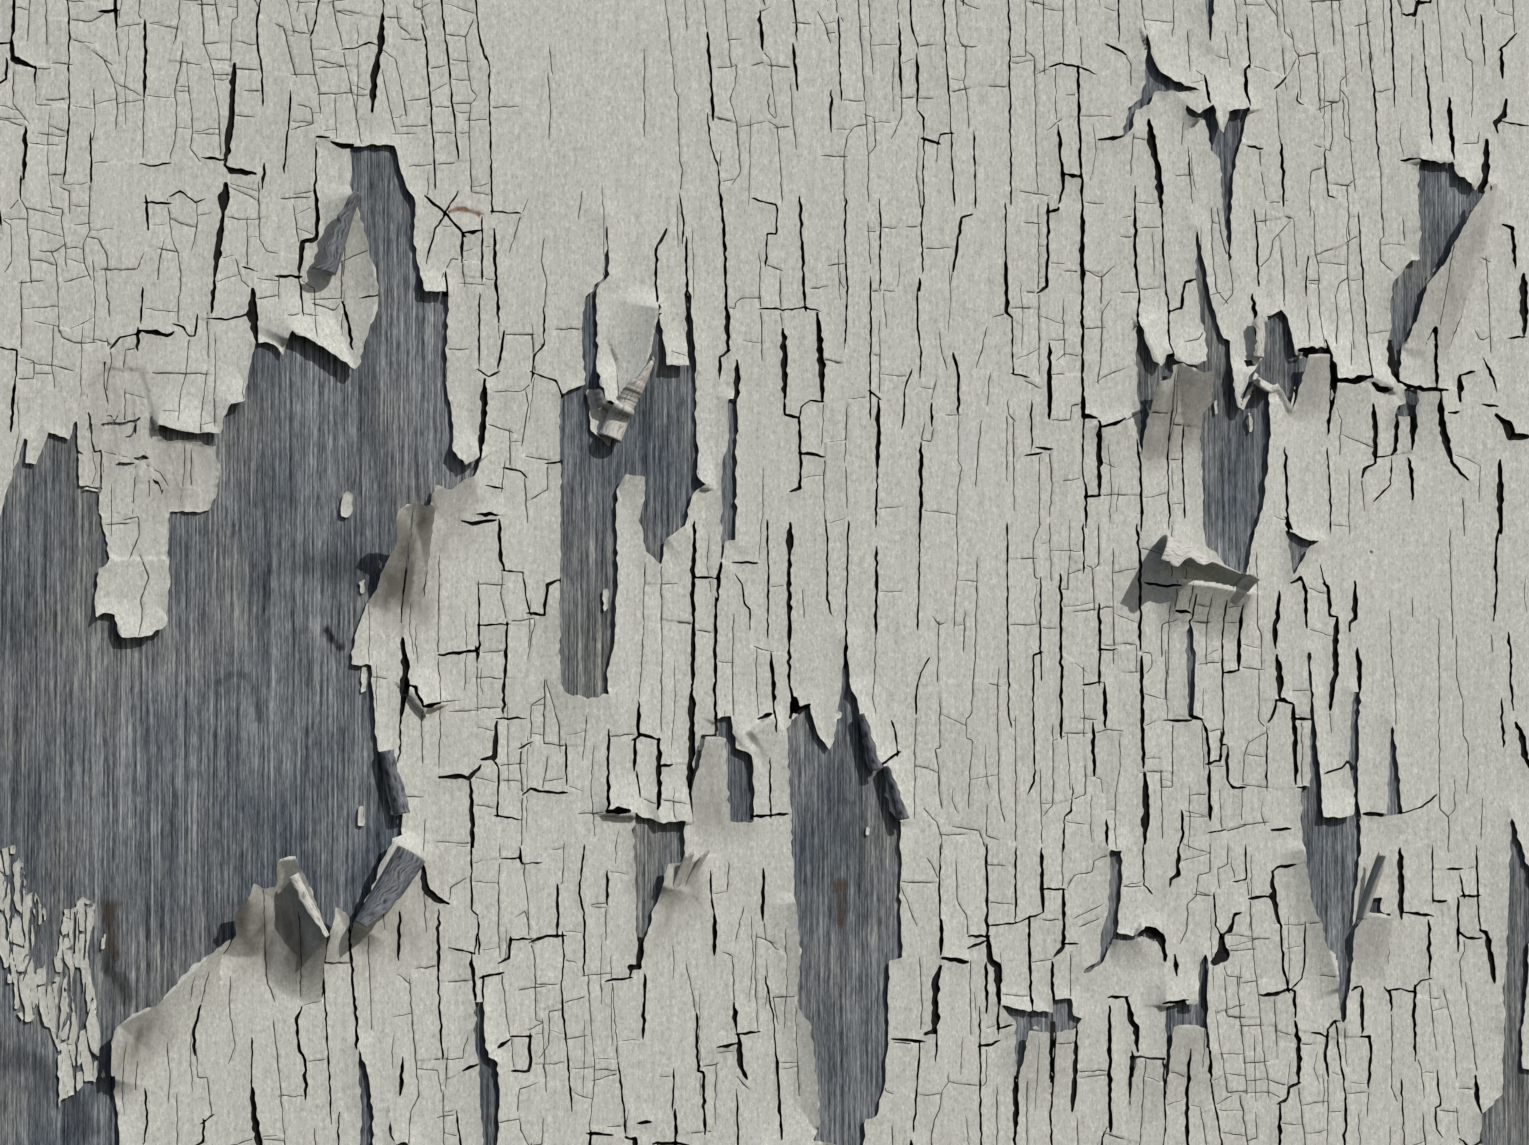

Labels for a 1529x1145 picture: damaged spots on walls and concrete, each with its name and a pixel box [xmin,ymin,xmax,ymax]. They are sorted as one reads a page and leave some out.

peeling [0,65,486,1145]
crack [0,0,809,1145]
peeling [499,227,738,746]
peeling [1080,0,1311,732]
peeling [1286,529,1318,574]
peeling [1347,24,1494,456]
peeling [775,621,943,1145]